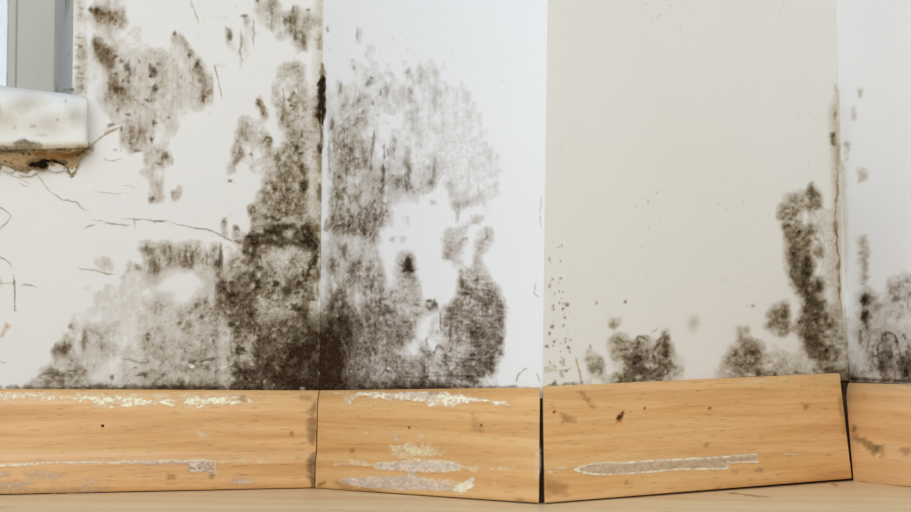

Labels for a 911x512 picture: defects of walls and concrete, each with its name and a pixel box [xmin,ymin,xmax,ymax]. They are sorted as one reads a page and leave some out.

water stain [93,41,131,111]
water stain [292,70,326,153]
water stain [0,139,42,151]
spalling [0,143,93,177]
water stain [138,111,504,390]
water stain [772,189,911,383]
water stain [46,342,127,390]
water stain [614,336,675,383]
water stain [727,341,777,377]